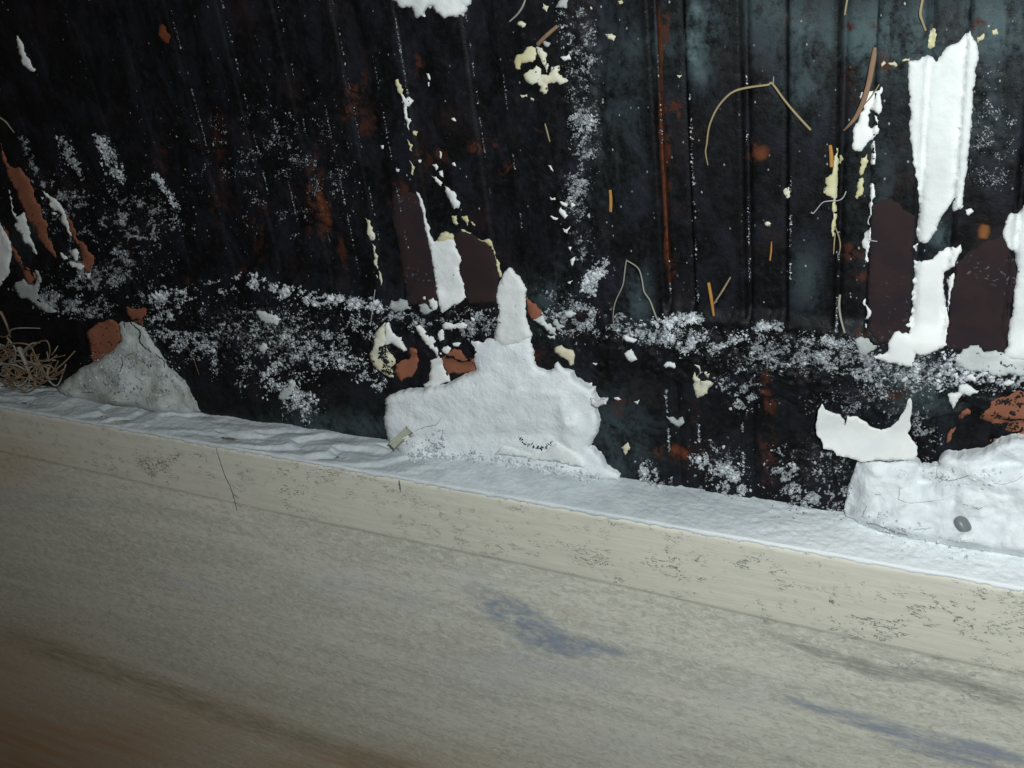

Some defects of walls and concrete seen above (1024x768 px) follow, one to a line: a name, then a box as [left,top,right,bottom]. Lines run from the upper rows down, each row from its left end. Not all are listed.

corrosion [658,21,670,260]
damp [18,89,501,428]
flaking render [395,347,419,381]
peeling [391,192,438,311]
flaking render [438,329,476,374]
peeling [454,216,499,304]
damp [541,256,1024,461]
peeling [855,178,918,344]
peeling [946,235,1017,354]
damp [634,459,673,491]
damp [687,423,854,522]
peeling [816,398,918,462]